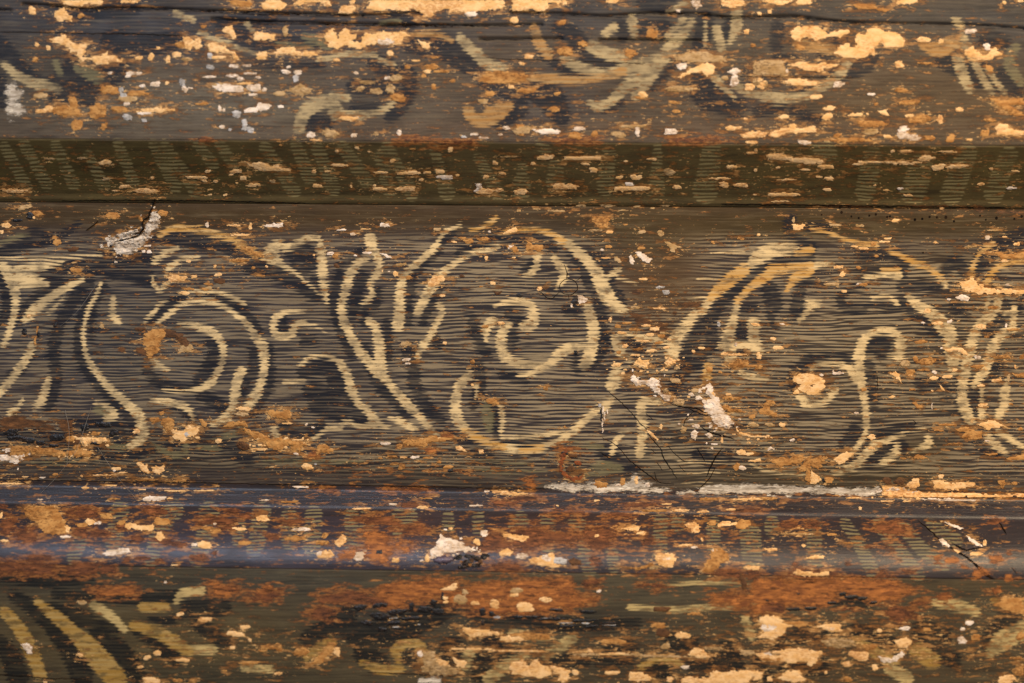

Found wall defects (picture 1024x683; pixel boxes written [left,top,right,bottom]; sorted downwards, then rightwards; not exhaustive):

peeling [32,25,239,65]
peeling [324,28,456,102]
peeling [229,0,567,24]
peeling [665,26,943,202]
peeling [831,88,1024,171]
crack [115,199,155,242]
crack [602,392,733,490]
spalling [848,474,1024,510]
spalling [420,527,582,569]
peeling [620,497,778,572]
crack [919,521,1017,580]
peeling [417,607,932,683]